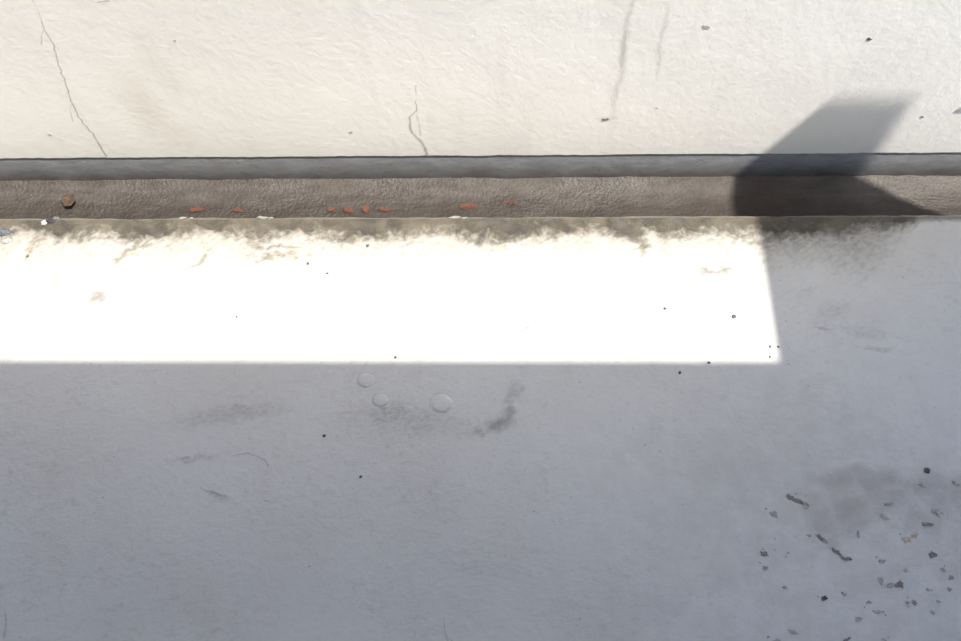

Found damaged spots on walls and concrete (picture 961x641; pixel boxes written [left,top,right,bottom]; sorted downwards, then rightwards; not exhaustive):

leakage [0,216,915,245]
peeling [900,509,943,543]
peeling [807,534,852,561]
peeling [878,568,917,607]